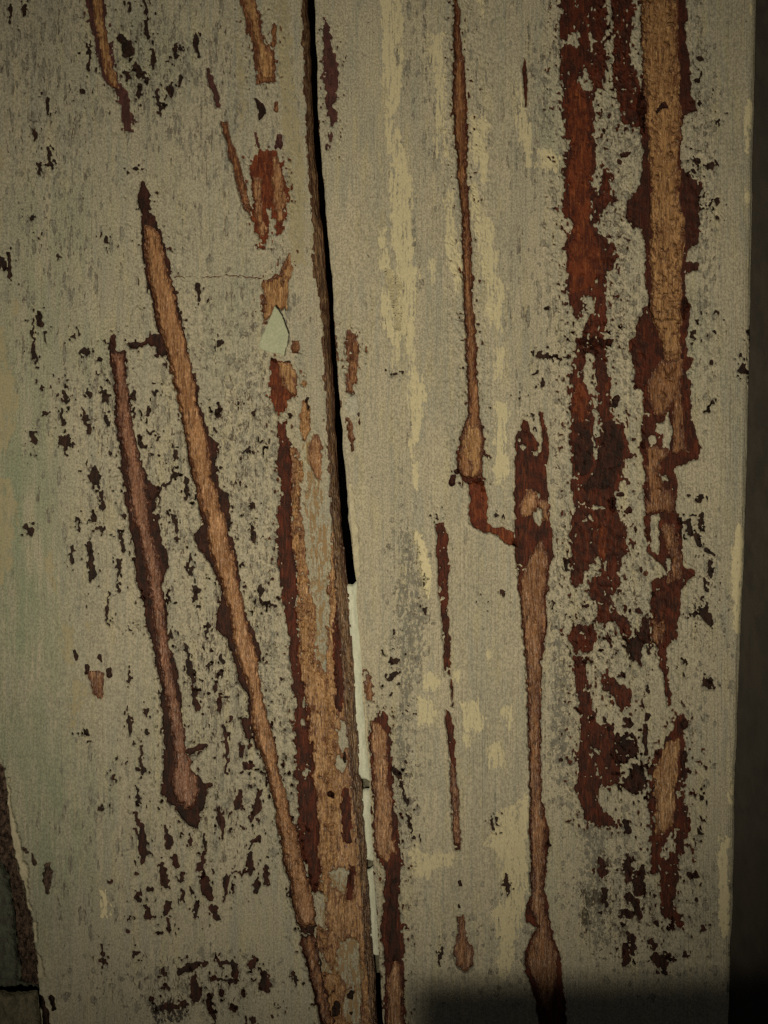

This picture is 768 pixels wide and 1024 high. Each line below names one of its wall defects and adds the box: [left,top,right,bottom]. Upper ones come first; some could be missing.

peeling [4,0,33,30]
peeling [0,247,20,285]
peeling [24,0,421,1024]
spalling [429,507,462,850]
spalling [444,0,728,1024]